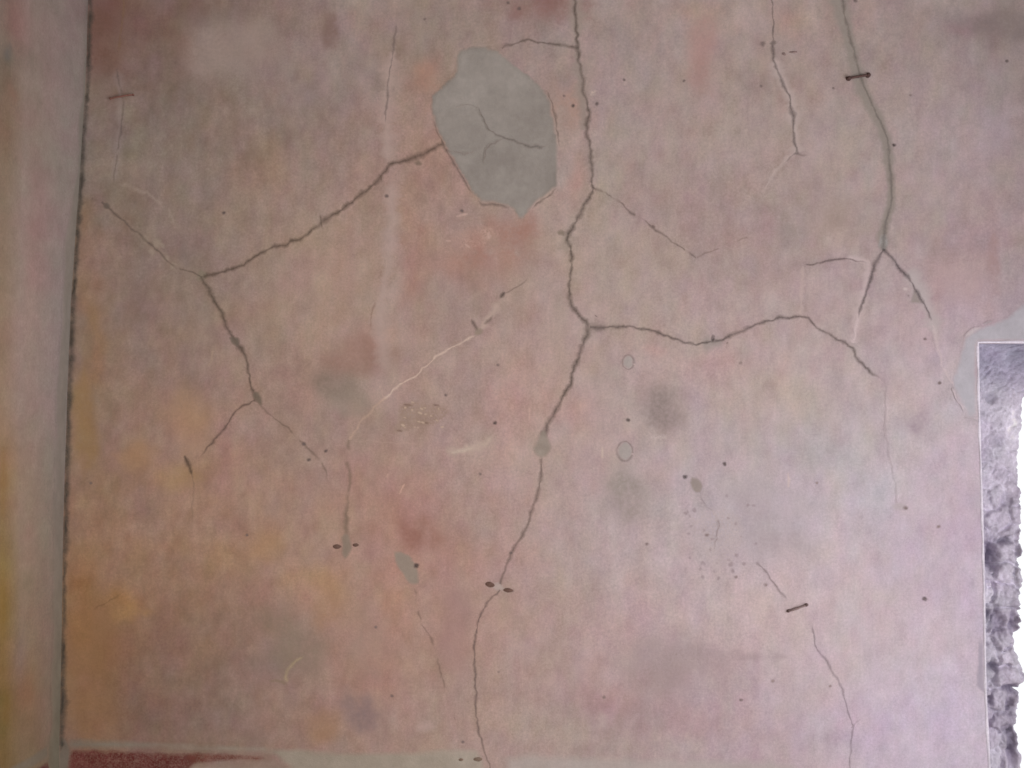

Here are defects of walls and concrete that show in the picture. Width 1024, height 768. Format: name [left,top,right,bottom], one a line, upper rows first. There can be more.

crack [59,0,530,752]
crack [413,0,956,768]